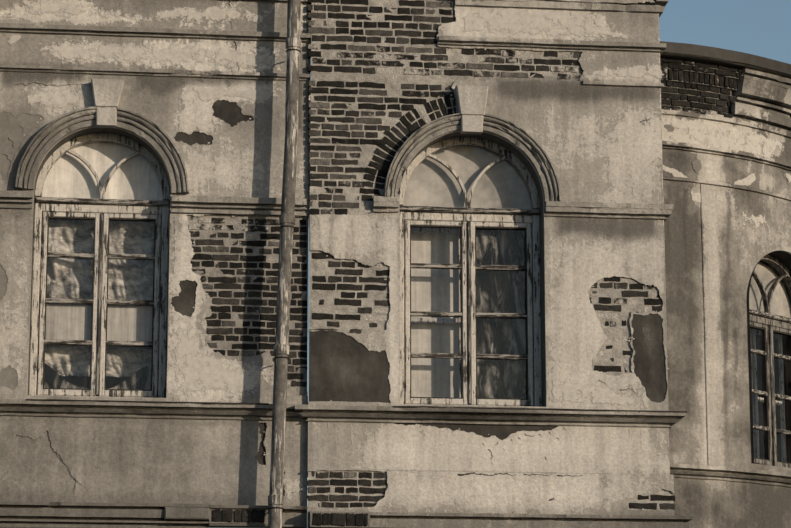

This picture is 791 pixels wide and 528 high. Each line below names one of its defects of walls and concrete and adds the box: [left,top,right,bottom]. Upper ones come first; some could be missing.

peeling [151,6,266,23]
peeling [0,89,84,181]
spalling [174,132,213,146]
spalling [212,100,273,129]
flaking render [597,57,782,178]
flaking render [287,0,663,396]
flaking render [173,214,280,397]
crack [16,430,81,494]
spalling [255,423,267,465]
spalling [394,423,558,440]
flaking render [301,468,389,528]
flaking render [626,489,676,511]